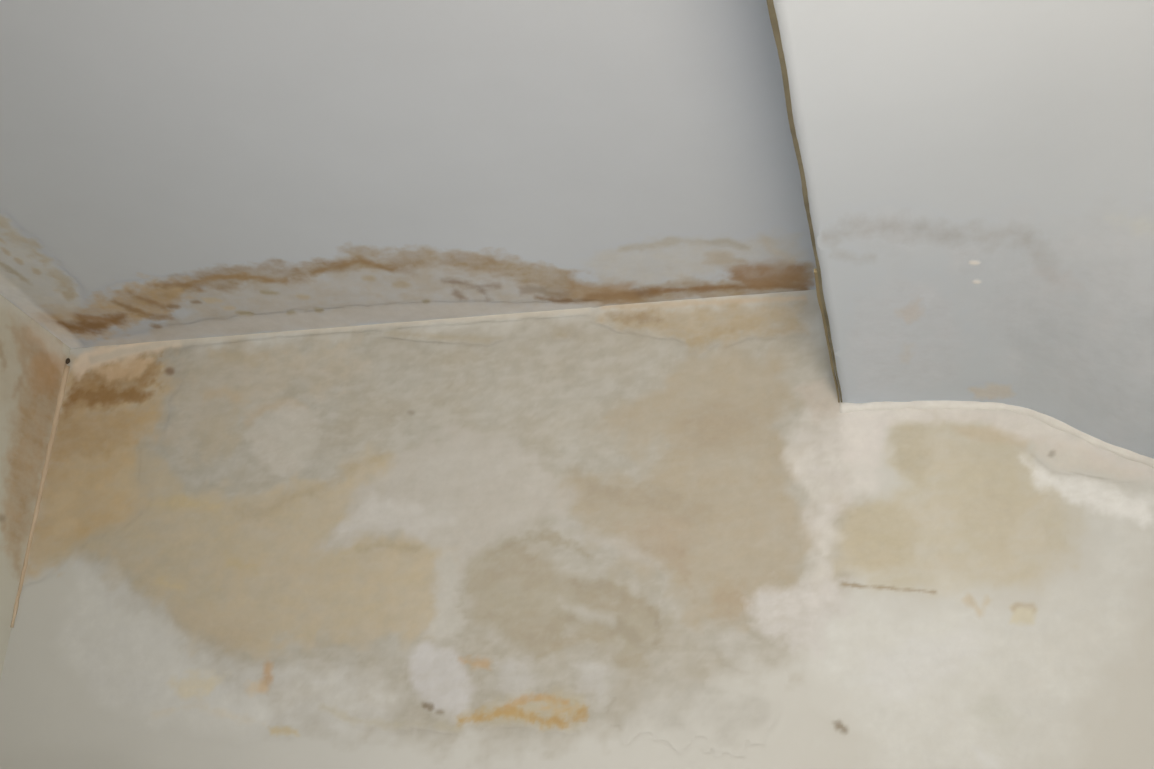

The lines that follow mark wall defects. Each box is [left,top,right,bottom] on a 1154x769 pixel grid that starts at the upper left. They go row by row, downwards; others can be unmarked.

water stain [0,185,1154,769]